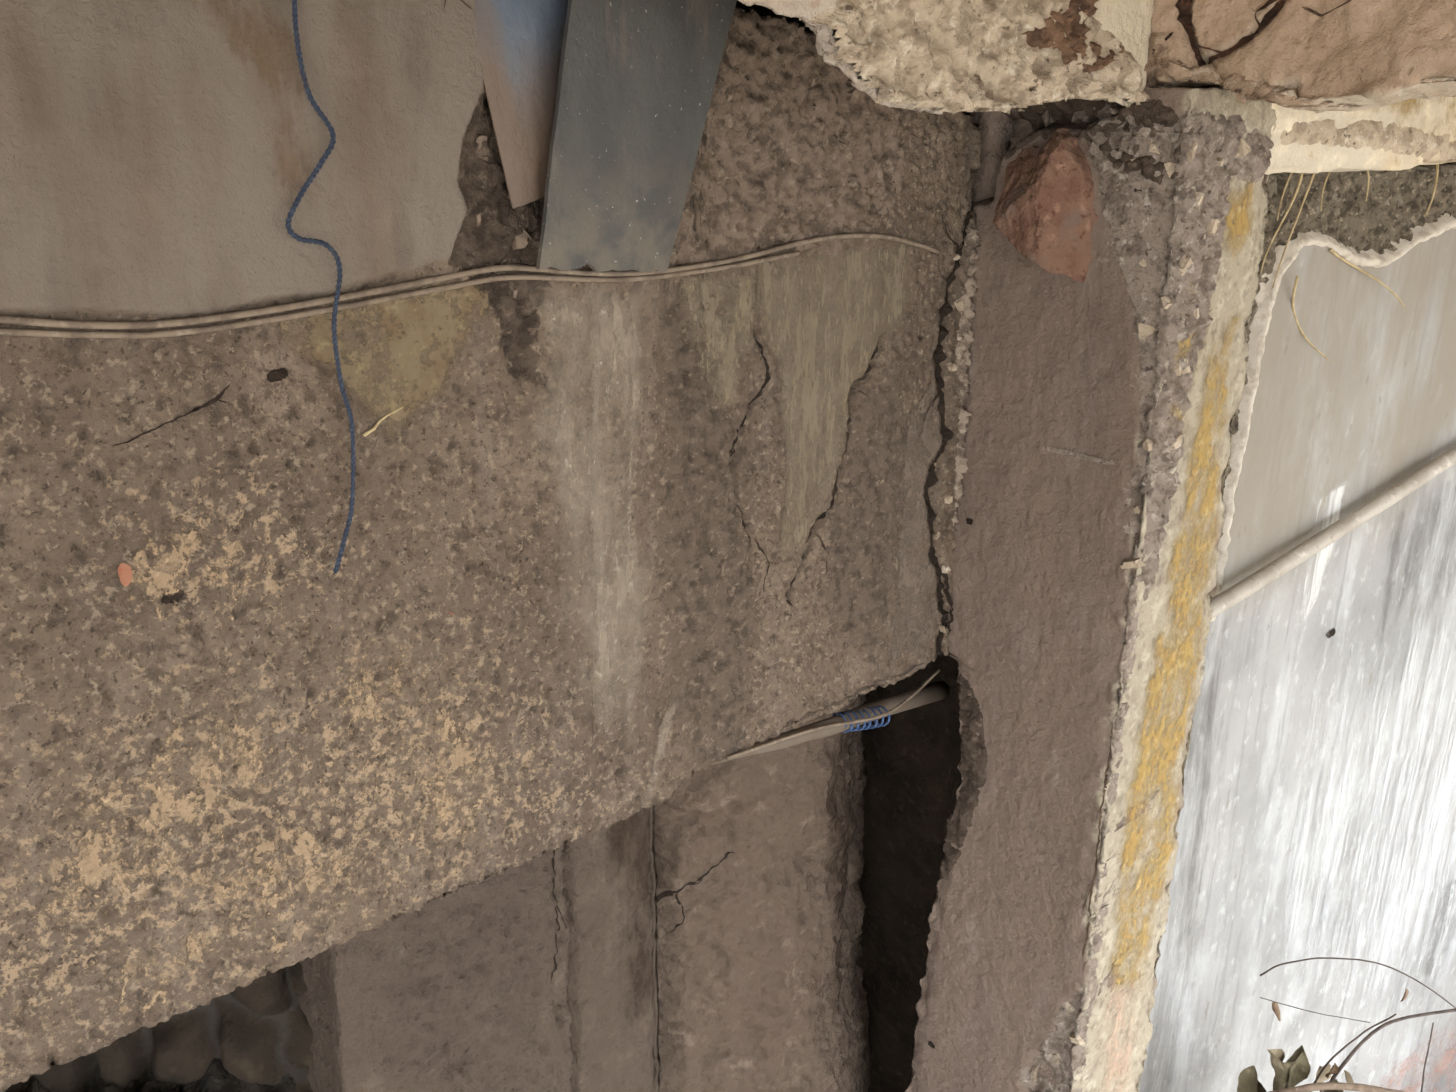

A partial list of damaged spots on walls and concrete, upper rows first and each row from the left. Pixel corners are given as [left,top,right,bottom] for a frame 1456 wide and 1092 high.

crack [728,330,878,606]
crack [918,201,974,656]
crack [656,852,735,936]
damp [1107,318,1237,1089]